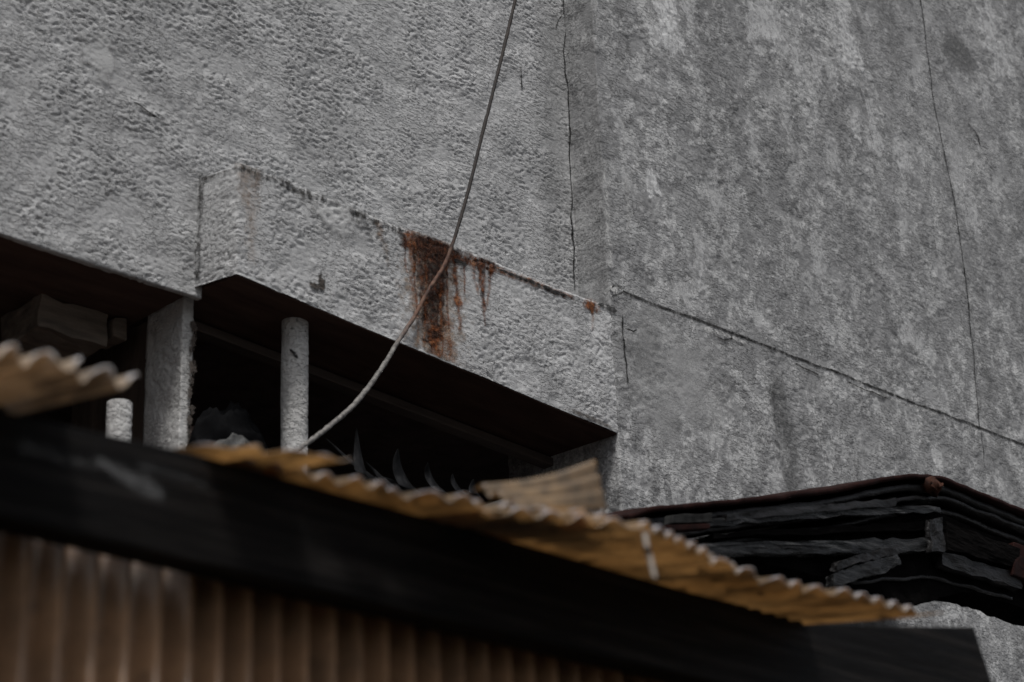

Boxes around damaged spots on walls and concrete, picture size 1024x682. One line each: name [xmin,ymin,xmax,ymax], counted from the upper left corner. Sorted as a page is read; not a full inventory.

rust [402,230,598,360]
crack [496,0,575,300]
crack [598,0,1024,464]